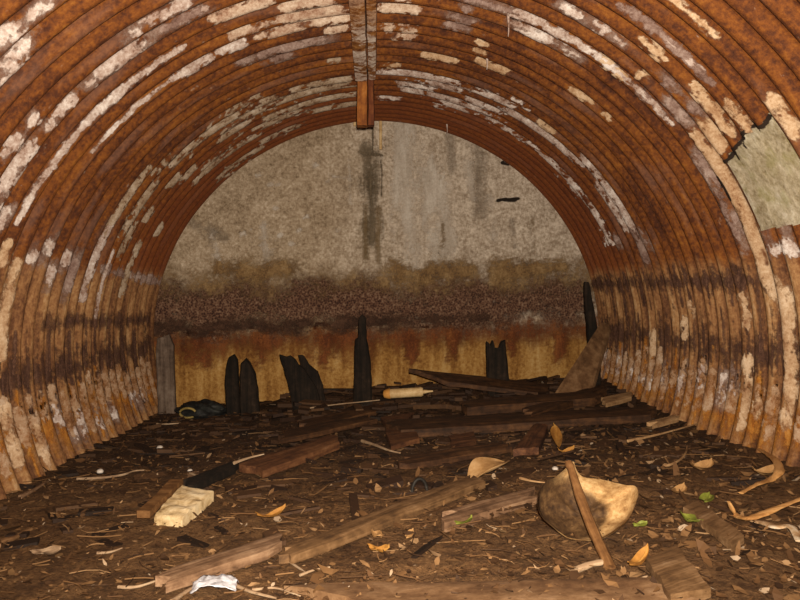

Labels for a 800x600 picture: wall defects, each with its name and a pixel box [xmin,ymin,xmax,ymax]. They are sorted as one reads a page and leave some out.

peeling [377,0,423,41]
peeling [443,0,586,63]
peeling [555,0,626,49]
peeling [638,36,669,62]
peeling [0,0,350,230]
peeling [0,233,85,362]
peeling [0,356,157,478]
rust [0,375,157,477]
rust [154,315,587,369]
water stain [0,37,800,416]
spalling [599,54,800,442]
rust [602,339,800,451]